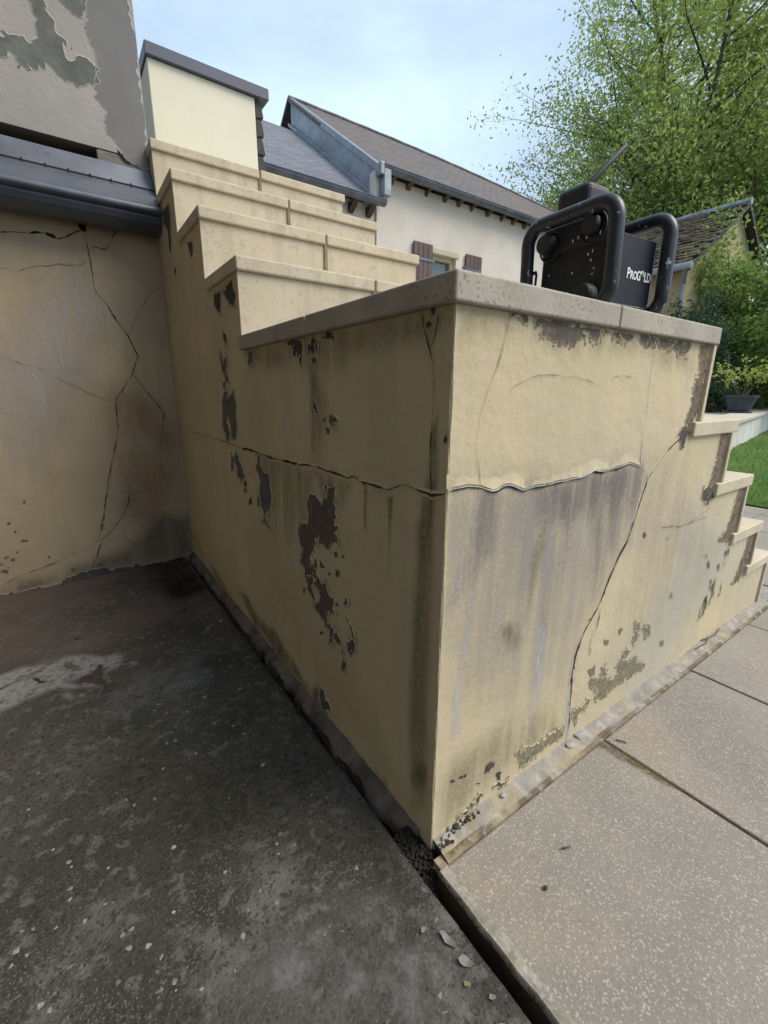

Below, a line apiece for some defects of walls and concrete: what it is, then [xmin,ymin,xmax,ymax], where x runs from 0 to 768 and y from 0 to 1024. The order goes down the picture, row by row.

peeling [0,0,100,89]
peeling [213,279,237,317]
crack [2,224,446,582]
peeling [218,330,274,534]
peeling [297,481,358,676]
crack [468,319,683,740]
peeling [509,312,710,450]
flaking render [700,433,728,506]
flaking render [718,487,745,546]
flaking render [730,534,755,586]
peeling [515,620,664,769]